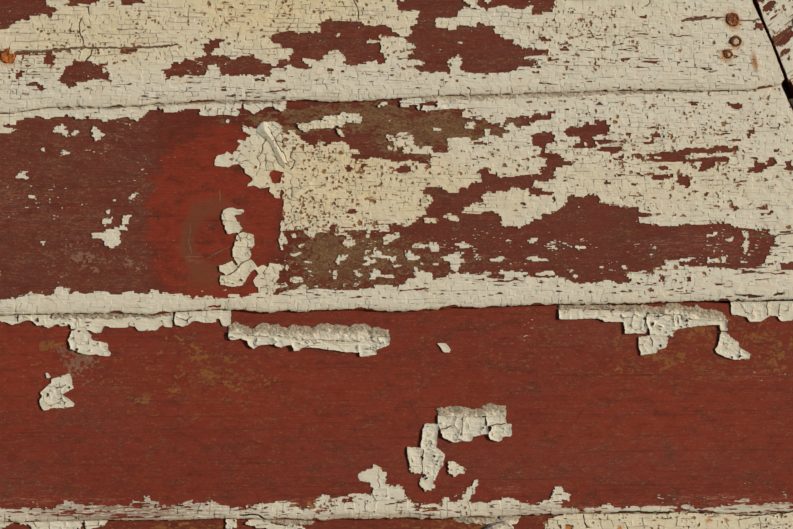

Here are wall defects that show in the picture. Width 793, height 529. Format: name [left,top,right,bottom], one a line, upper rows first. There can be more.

crack [14,8,177,61]
crack [682,15,760,23]
crack [257,132,295,170]
peeling [0,0,793,360]
crack [753,231,793,239]
crack [735,293,783,314]
peeling [407,414,512,492]
peeling [0,464,793,529]